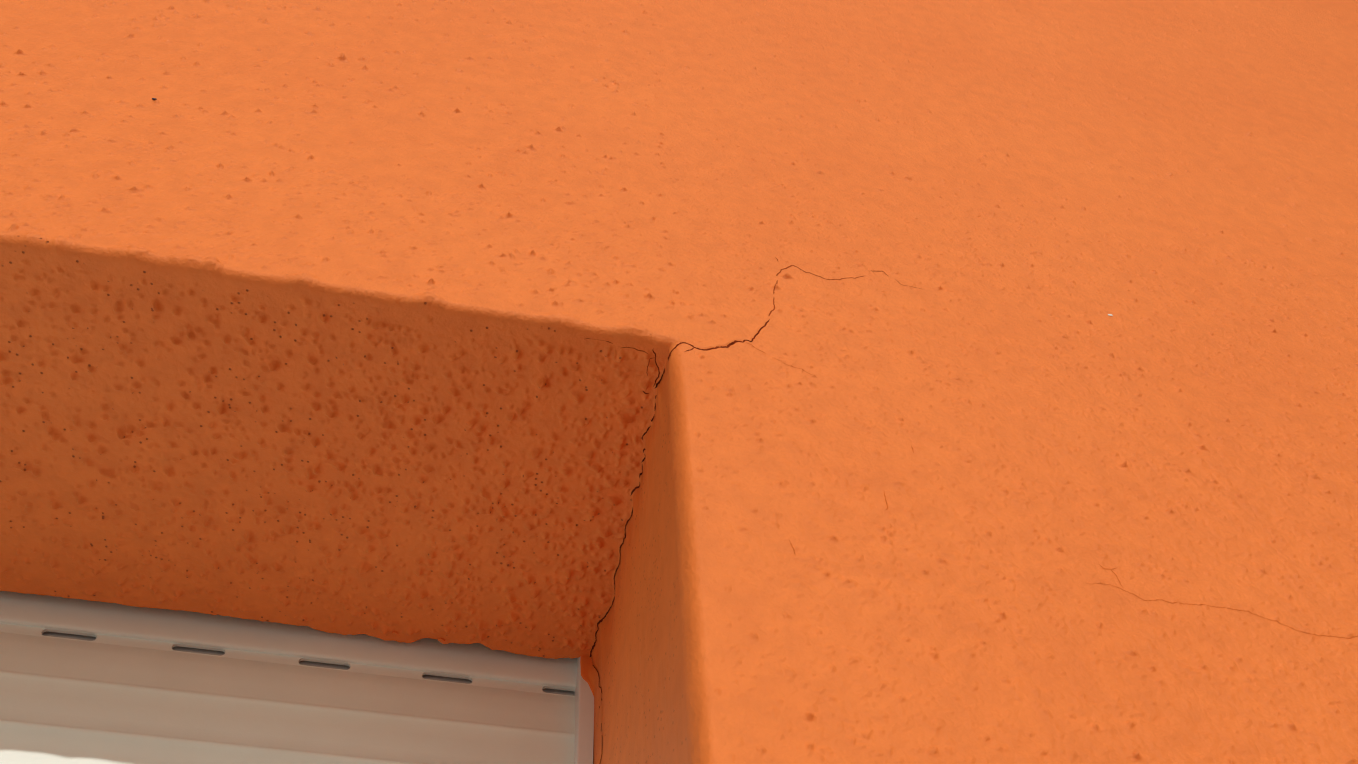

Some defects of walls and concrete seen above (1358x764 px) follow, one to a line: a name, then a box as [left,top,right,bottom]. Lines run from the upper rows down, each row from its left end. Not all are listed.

crack [587,258,916,708]
crack [1093,565,1357,639]